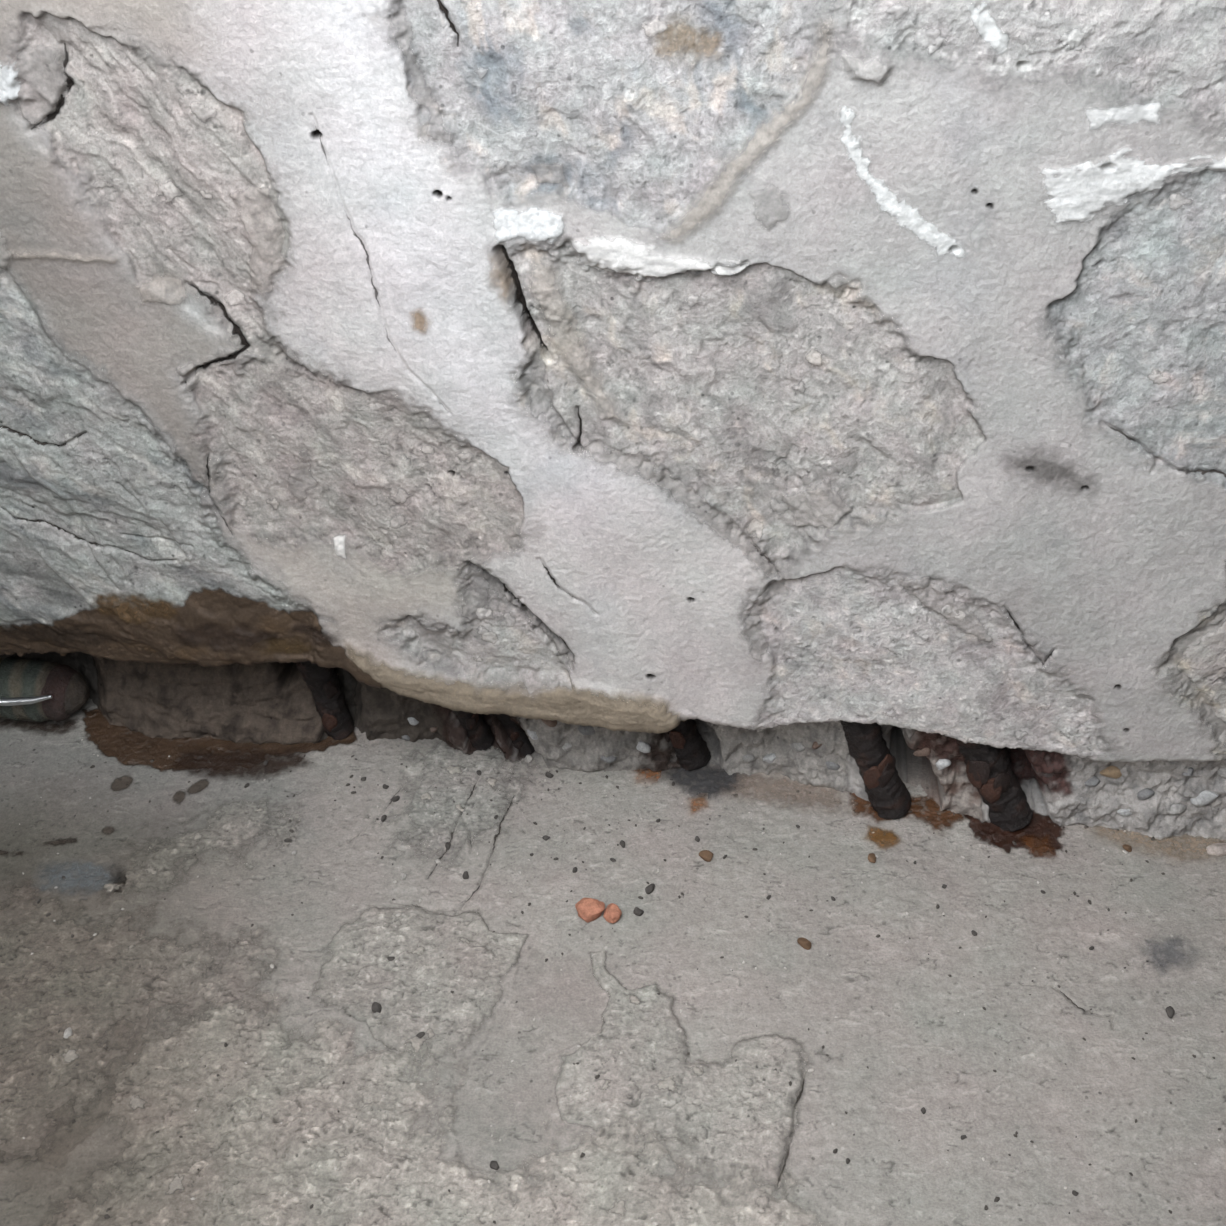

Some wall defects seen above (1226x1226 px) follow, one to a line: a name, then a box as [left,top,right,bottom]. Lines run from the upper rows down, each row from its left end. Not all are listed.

spalling [388,0,1226,241]
spalling [0,12,574,693]
crack [348,218,379,304]
crack [502,245,548,350]
spalling [1047,167,1226,488]
crack [0,426,86,446]
crack [575,407,583,442]
spalling [507,239,1111,832]
spalling [452,710,535,758]
rust [917,731,965,770]
rust [1007,748,1072,795]
rust [722,774,1064,857]